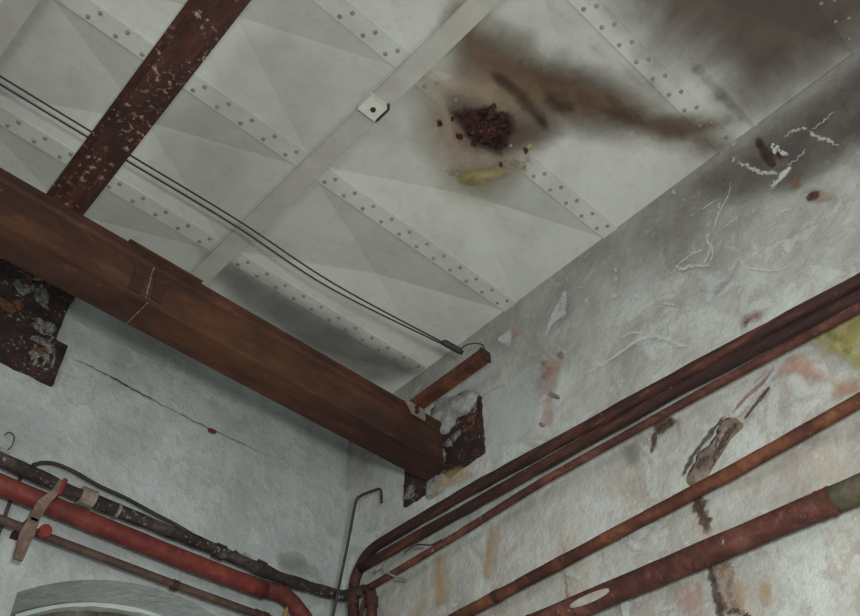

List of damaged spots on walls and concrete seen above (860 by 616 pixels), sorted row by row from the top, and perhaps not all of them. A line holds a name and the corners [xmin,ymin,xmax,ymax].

water stain [459,28,711,144]
crack [81,362,245,445]
spalling [683,360,785,486]
peeling [621,517,663,550]
spalling [693,496,712,532]
spalling [708,559,751,616]